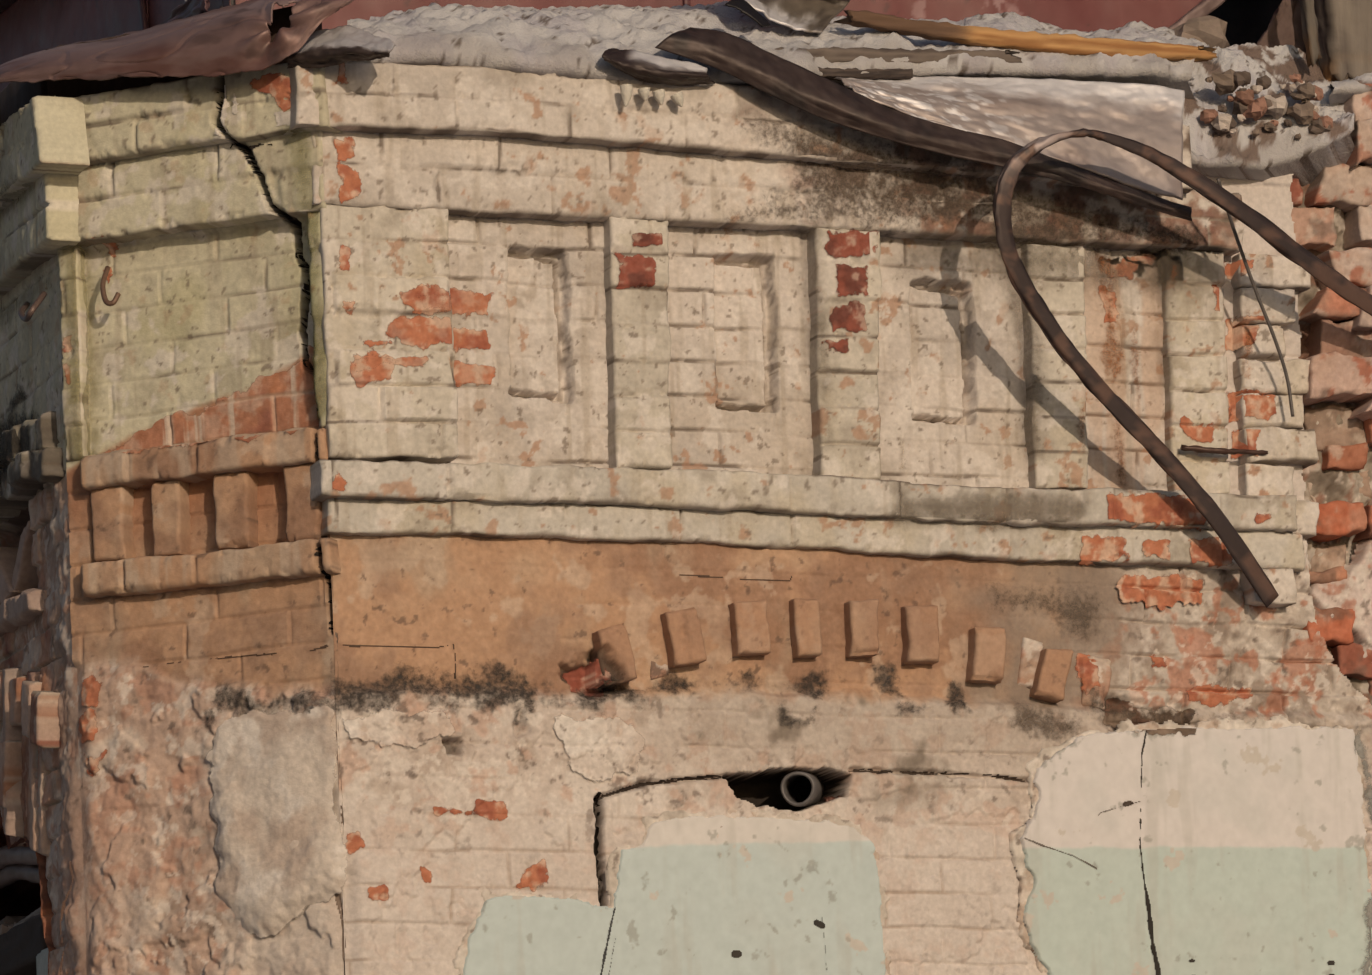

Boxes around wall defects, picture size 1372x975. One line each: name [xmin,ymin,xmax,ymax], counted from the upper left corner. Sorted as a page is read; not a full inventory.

peeling [333,137,362,204]
crack [216,91,318,456]
peeling [339,245,351,271]
peeling [350,283,496,388]
leakage [0,386,37,484]
peeling [89,345,319,457]
peeling [332,473,347,491]
peeling [1079,493,1233,610]
peeling [1255,513,1271,524]
spalling [562,659,612,697]
crack [1024,838,1097,870]
crack [1098,733,1161,975]